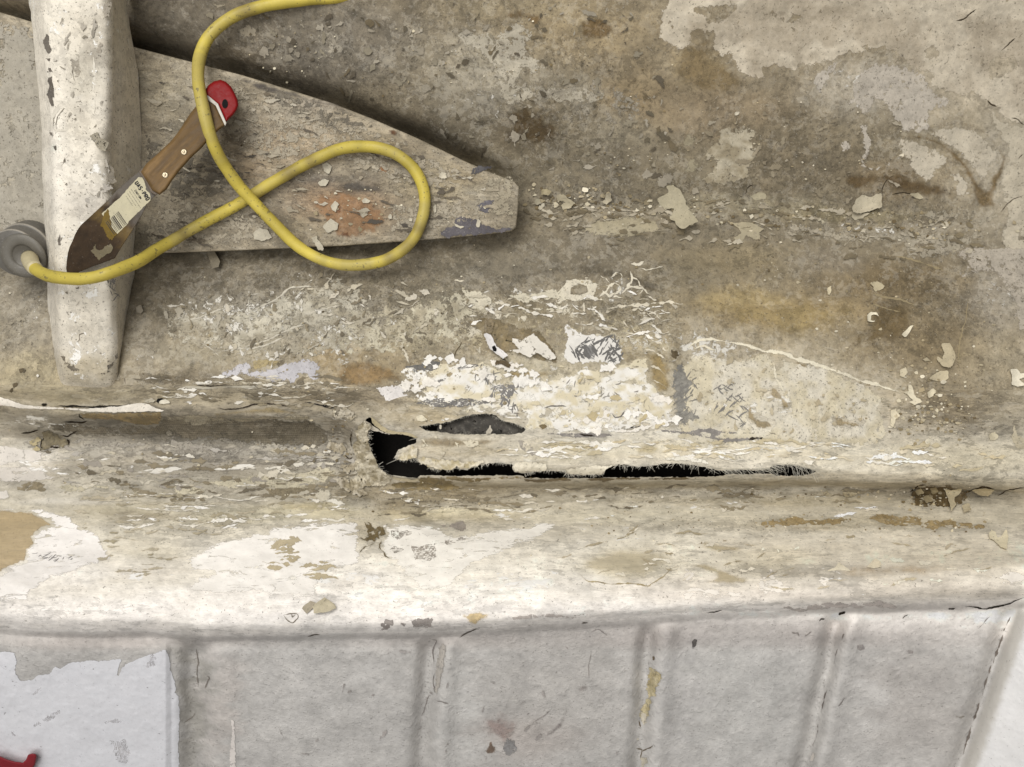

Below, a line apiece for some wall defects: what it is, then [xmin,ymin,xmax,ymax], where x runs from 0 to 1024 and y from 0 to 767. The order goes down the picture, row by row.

water stain [680,45,737,91]
water stain [848,176,942,194]
water stain [953,154,1001,205]
peeling [0,273,956,614]
crack [345,413,827,491]
spalling [747,485,1008,552]
peeling [513,614,584,626]